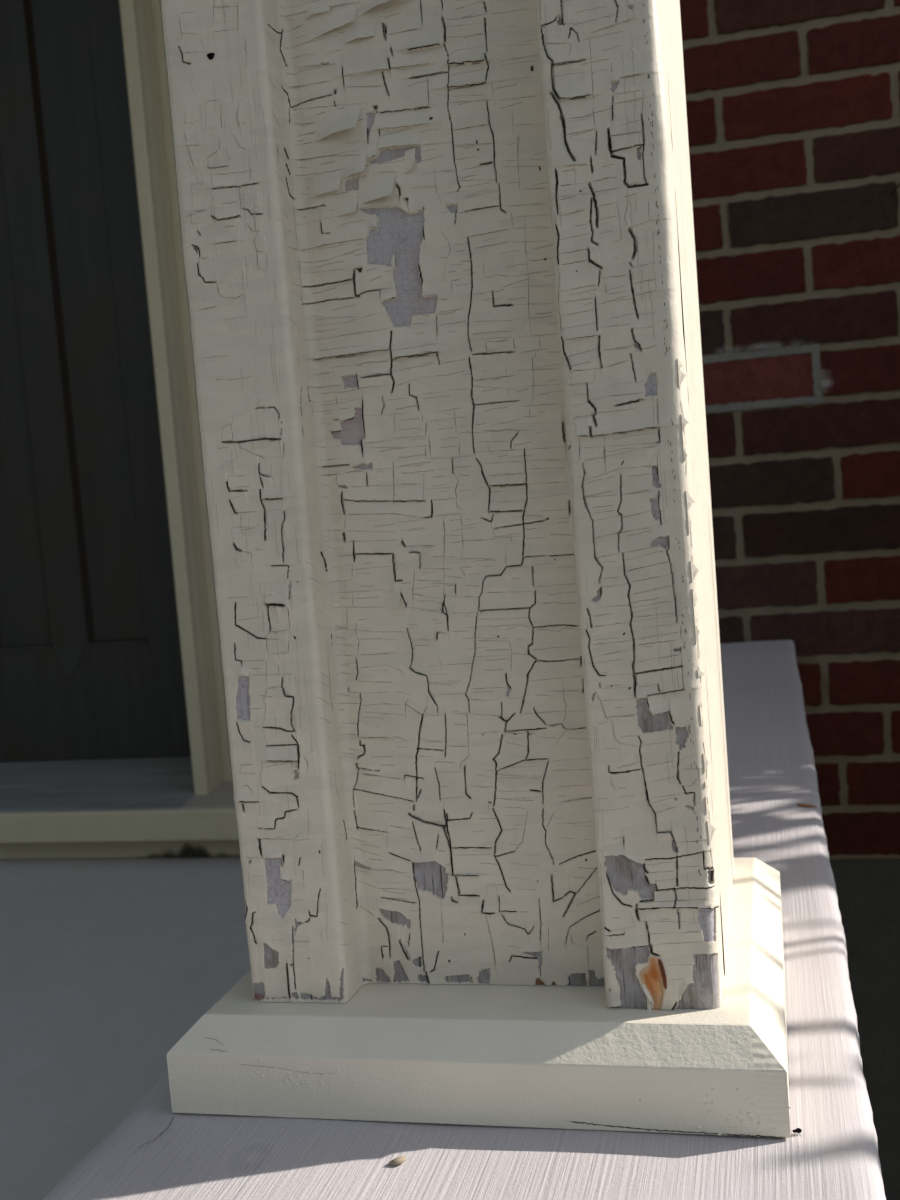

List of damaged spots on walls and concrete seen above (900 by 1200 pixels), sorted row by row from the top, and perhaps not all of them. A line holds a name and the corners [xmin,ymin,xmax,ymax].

peeling [305,0,391,42]
peeling [314,104,438,327]
peeling [677,359,688,476]
peeling [673,491,705,683]
peeling [236,663,299,792]
peeling [636,685,705,749]
peeling [248,838,305,933]
peeling [411,851,448,898]
peeling [602,843,656,904]
rust [640,957,667,1010]